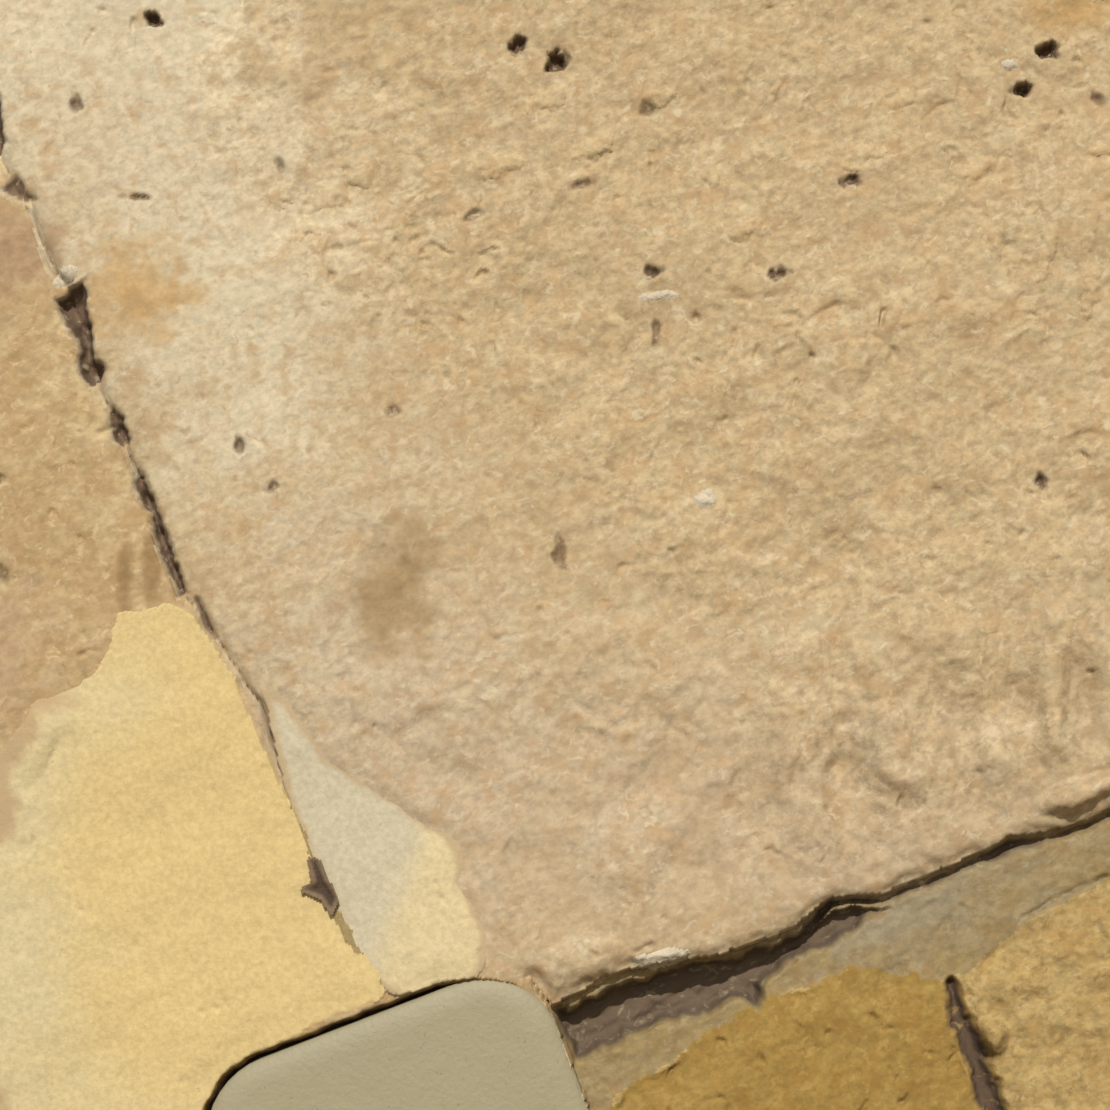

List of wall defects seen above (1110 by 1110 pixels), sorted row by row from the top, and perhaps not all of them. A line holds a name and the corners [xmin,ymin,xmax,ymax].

crack [0,94,286,792]
crack [550,807,1110,1063]